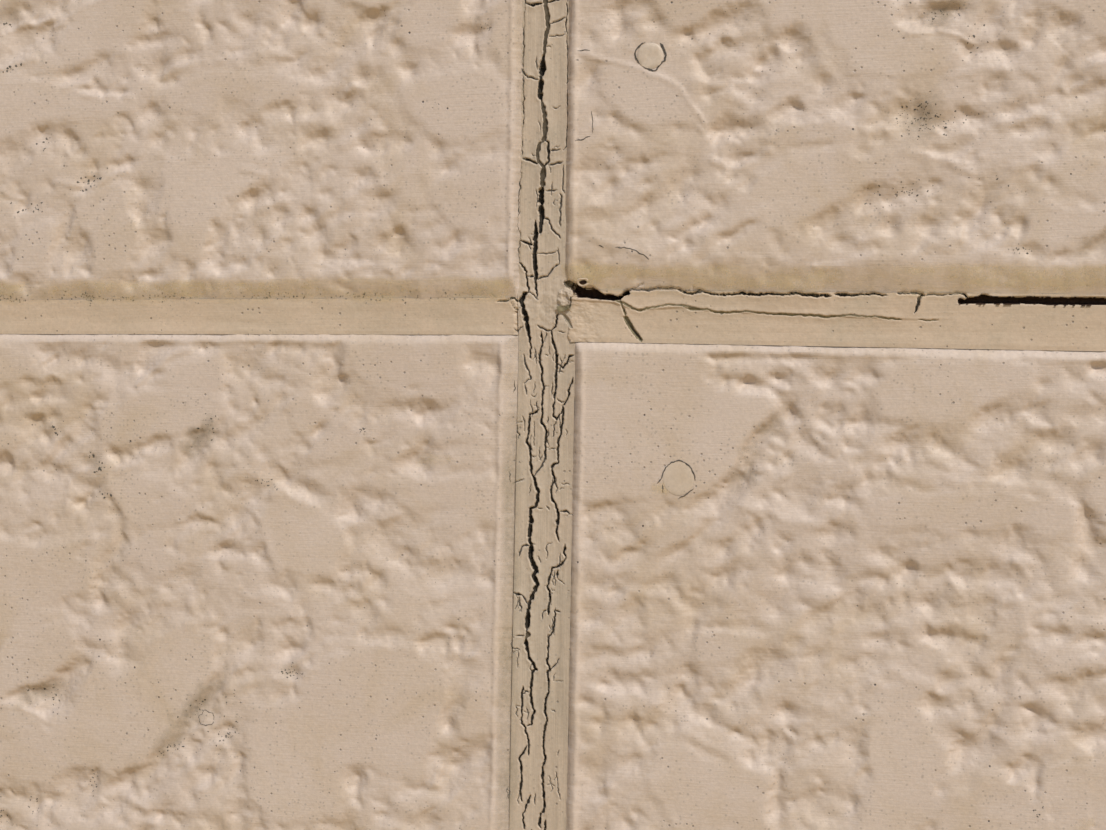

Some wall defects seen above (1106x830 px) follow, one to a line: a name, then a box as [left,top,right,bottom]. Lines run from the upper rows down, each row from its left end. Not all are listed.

crack [491,0,593,830]
crack [599,245,968,321]